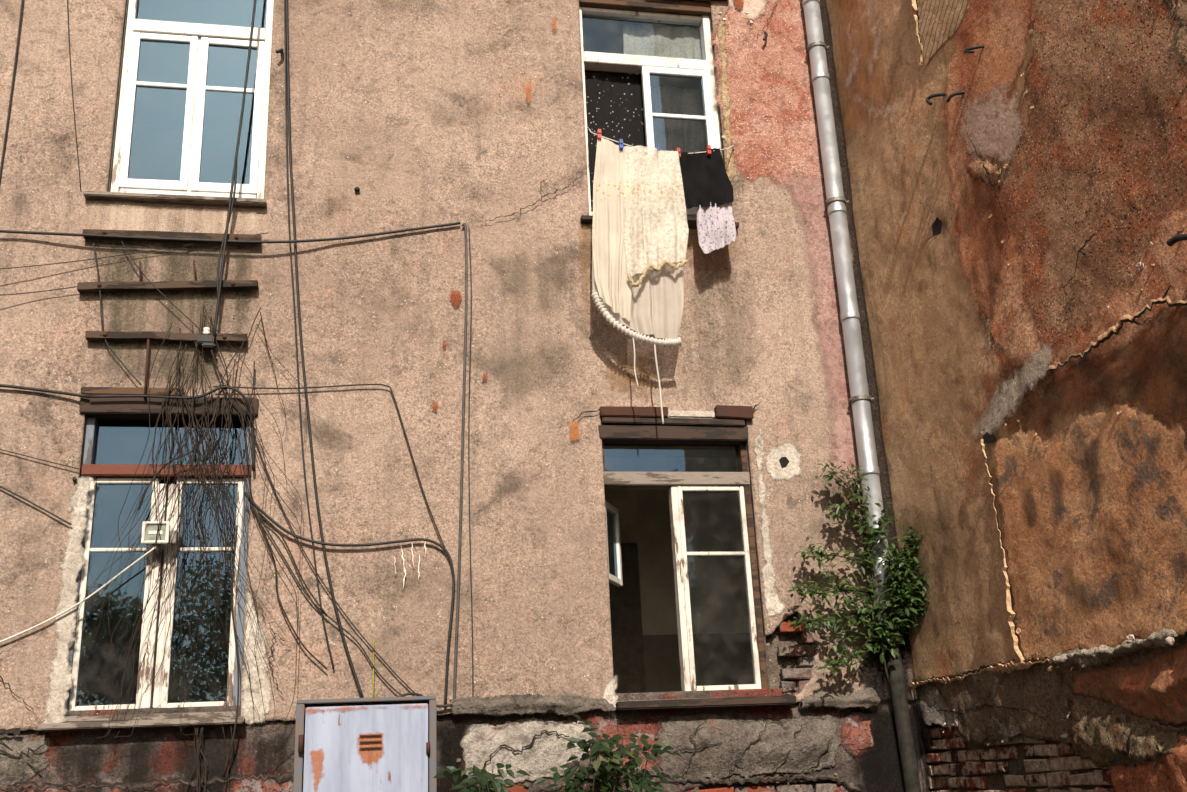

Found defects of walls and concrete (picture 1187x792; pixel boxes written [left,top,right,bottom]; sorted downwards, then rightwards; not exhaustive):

peeling [711,0,824,187]
crack [473,163,590,222]
peeling [911,0,1187,371]
crack [1059,223,1105,290]
crack [1047,285,1187,372]
peeling [994,404,1187,671]
crack [0,750,295,792]
rust [310,750,323,791]
rust [358,733,383,762]
peeling [457,712,661,792]
flaking render [683,774,855,792]
flaking render [919,686,1187,792]